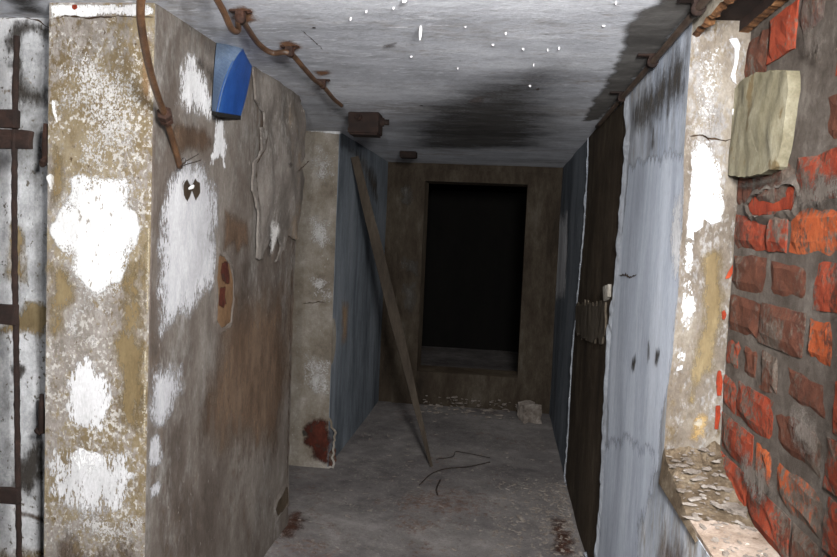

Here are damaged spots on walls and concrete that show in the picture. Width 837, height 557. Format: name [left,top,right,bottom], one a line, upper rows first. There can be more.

damp [51,145,63,202]
damp [112,246,147,430]